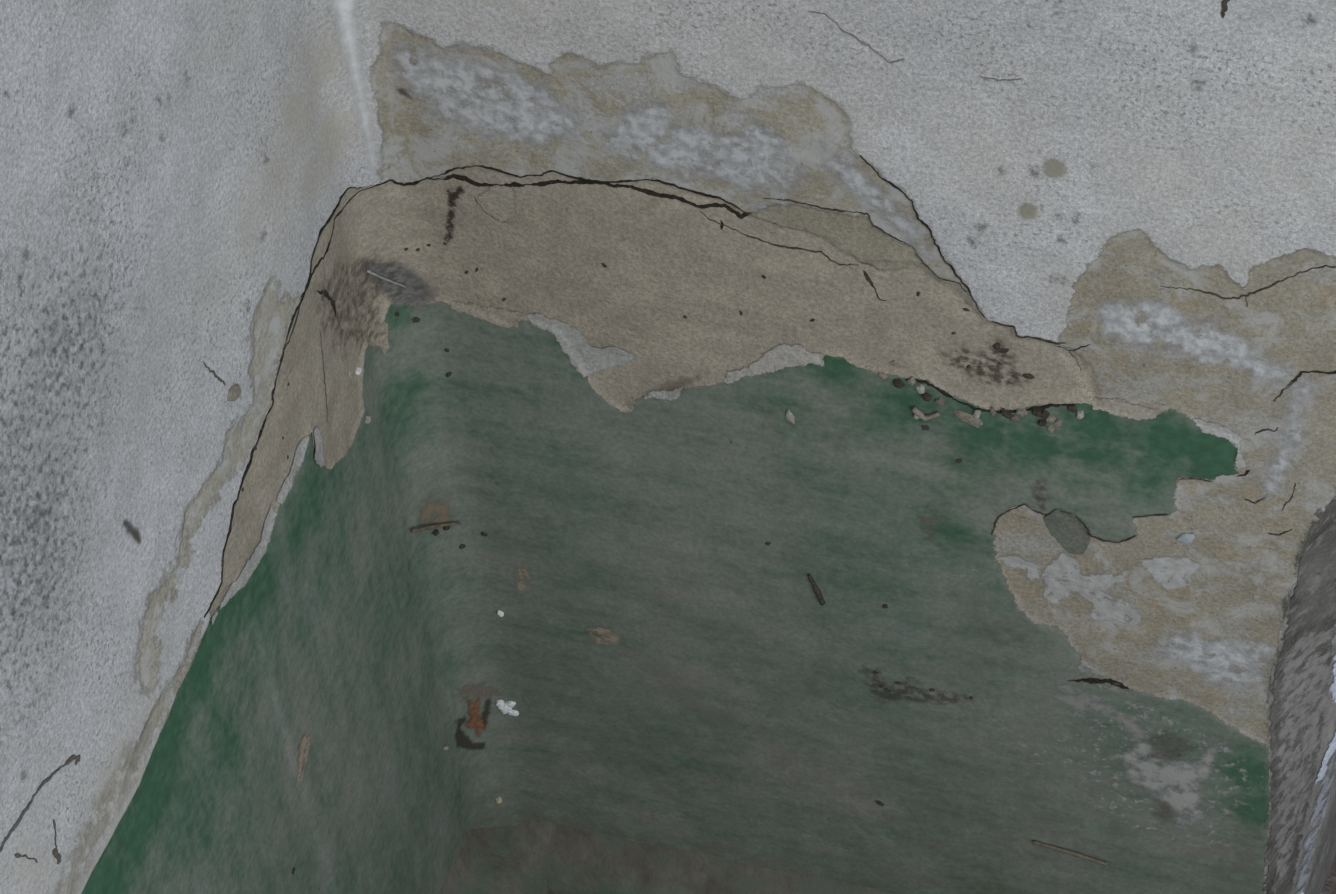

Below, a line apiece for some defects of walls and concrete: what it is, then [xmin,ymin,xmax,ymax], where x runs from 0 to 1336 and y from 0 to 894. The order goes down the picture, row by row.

peeling [369,22,972,299]
spalling [1046,161,1064,177]
crack [1161,265,1336,306]
crack [202,155,1091,618]
crack [1255,370,1336,435]
spalling [124,521,141,543]
flaking render [133,165,1336,894]
crack [991,503,1169,543]
crack [1179,470,1296,536]
corrosion [456,684,499,750]
peeling [59,620,203,893]